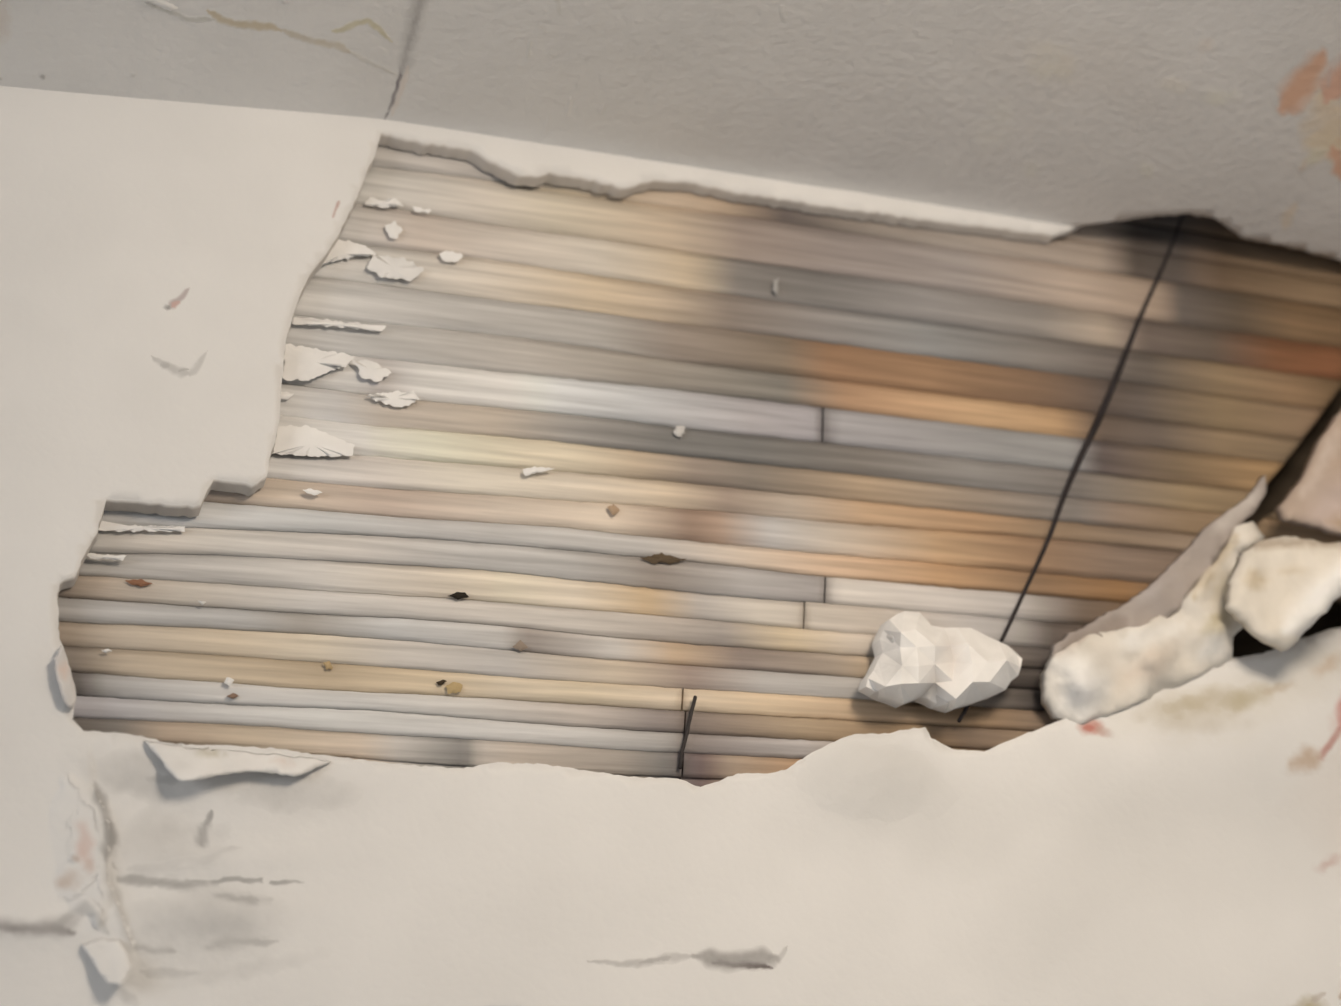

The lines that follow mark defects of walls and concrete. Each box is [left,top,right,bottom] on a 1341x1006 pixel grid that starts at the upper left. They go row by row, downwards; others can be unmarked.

crack [145,0,430,120]
corrosion [1274,46,1341,182]
flaking render [54,132,1056,788]
corrosion [1279,689,1341,777]
crack [0,780,305,980]
crack [586,944,788,974]